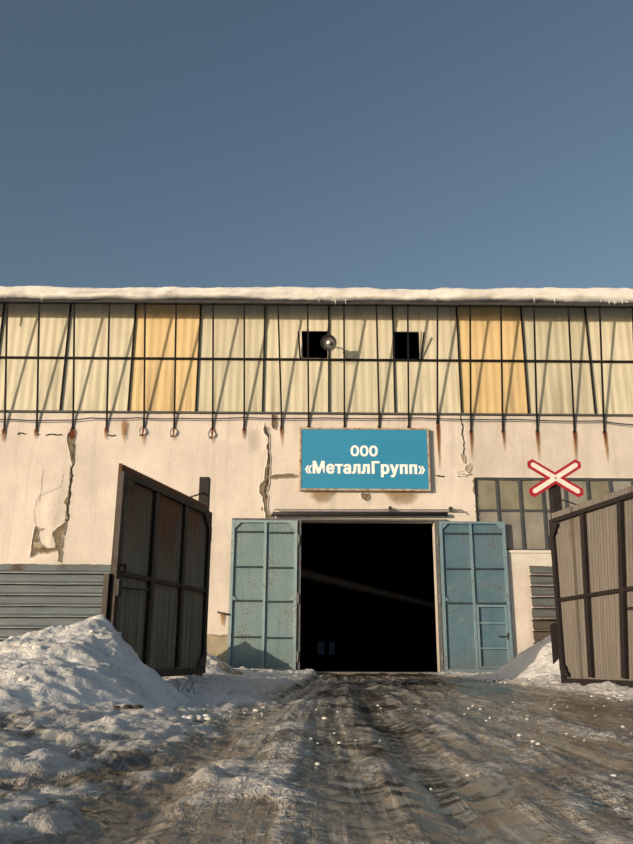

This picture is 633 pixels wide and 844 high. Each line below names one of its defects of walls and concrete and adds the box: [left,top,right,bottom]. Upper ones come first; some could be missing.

crack [17,428,77,539]
crack [258,423,298,518]
flaking render [29,522,67,563]